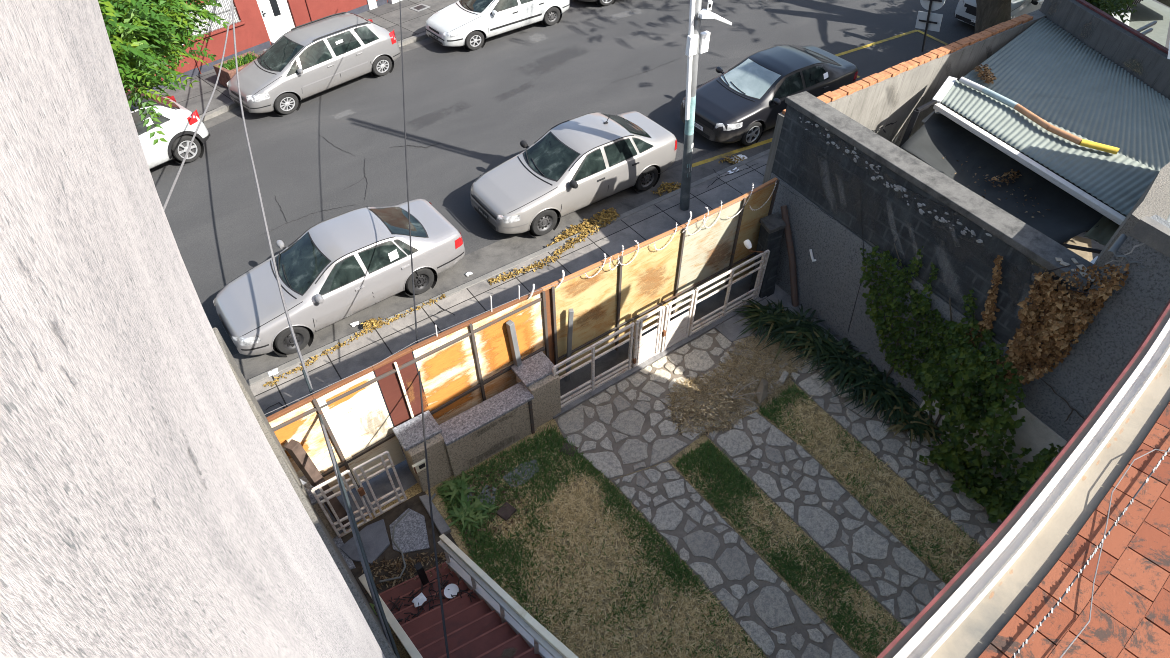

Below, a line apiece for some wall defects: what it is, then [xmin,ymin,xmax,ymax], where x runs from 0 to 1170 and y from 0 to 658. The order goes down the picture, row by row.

rust [568,274,599,294]
rust [708,244,729,267]
rust [481,301,535,372]
rust [423,341,473,420]